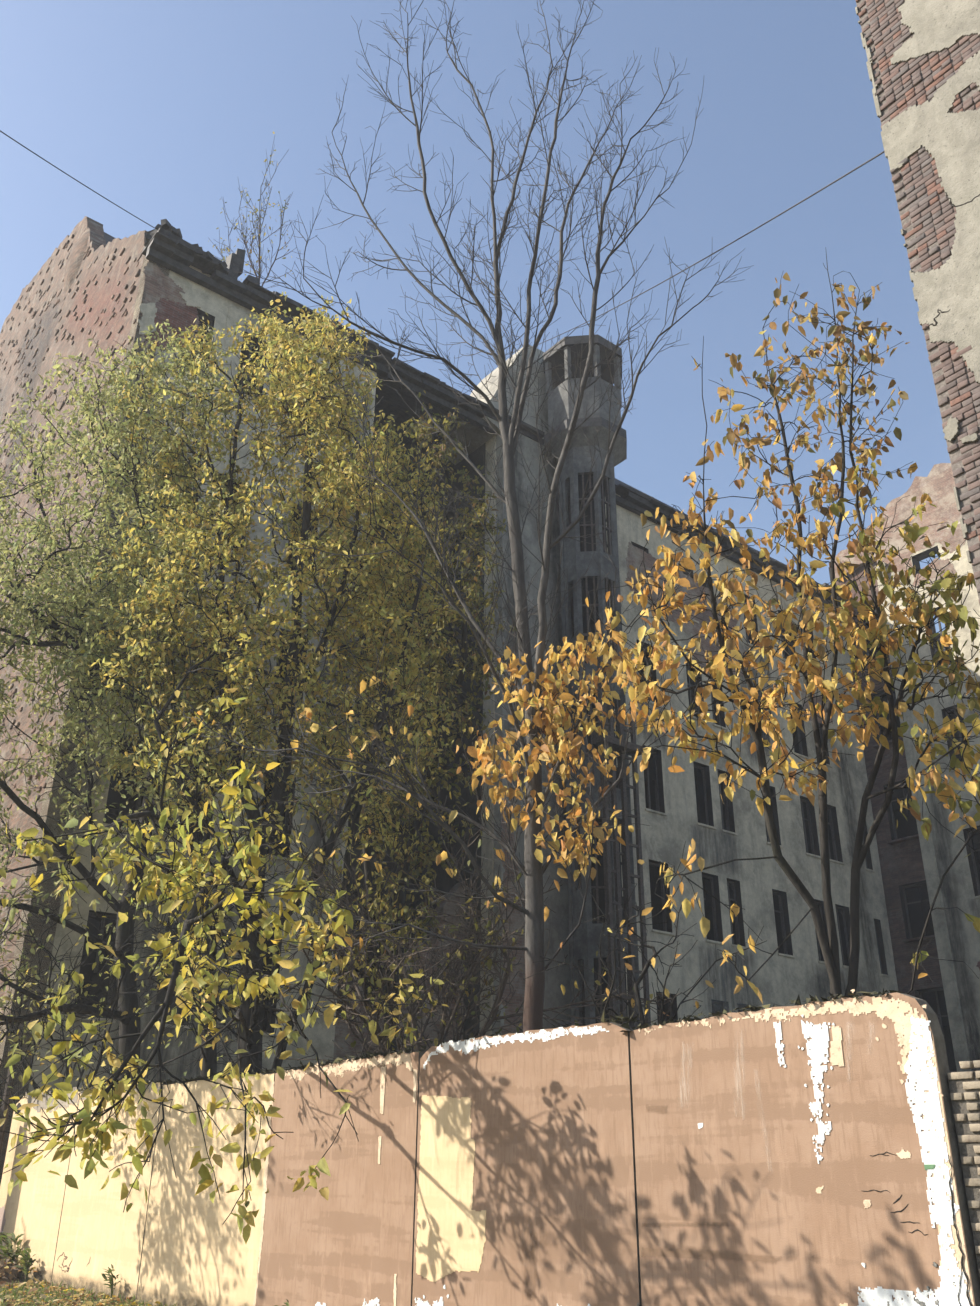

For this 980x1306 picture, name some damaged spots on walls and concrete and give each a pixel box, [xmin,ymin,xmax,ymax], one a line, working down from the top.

flaking render [855,0,980,130]
flaking render [137,262,202,375]
flaking render [890,146,957,273]
flaking render [877,323,980,605]
flaking render [253,807,609,1306]
peeling [638,989,974,1306]